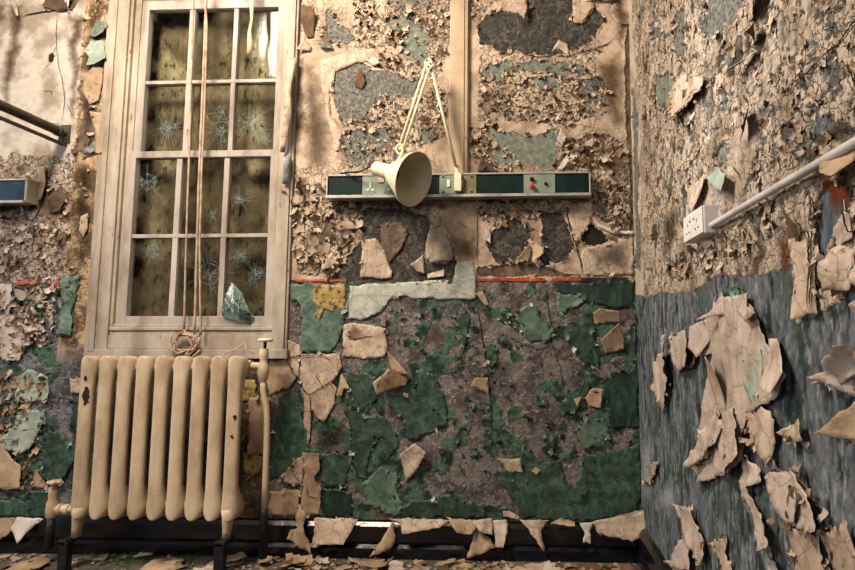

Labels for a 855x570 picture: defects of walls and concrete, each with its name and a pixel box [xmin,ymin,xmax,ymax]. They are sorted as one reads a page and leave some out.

damp [0,7,20,84]
damp [70,18,96,84]
damp [77,173,87,242]
peeling [0,165,93,493]